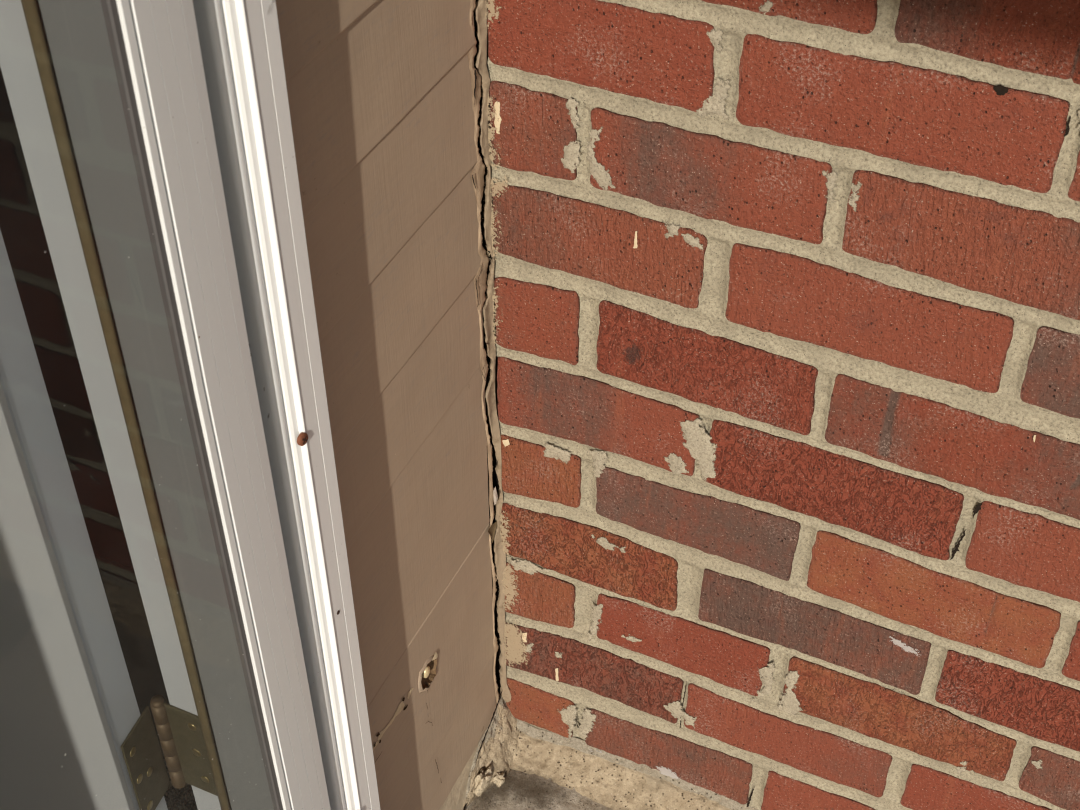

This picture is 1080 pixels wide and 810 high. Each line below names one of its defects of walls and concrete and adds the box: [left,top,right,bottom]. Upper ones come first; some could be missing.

peeling [373,652,438,750]
crack [472,0,513,761]